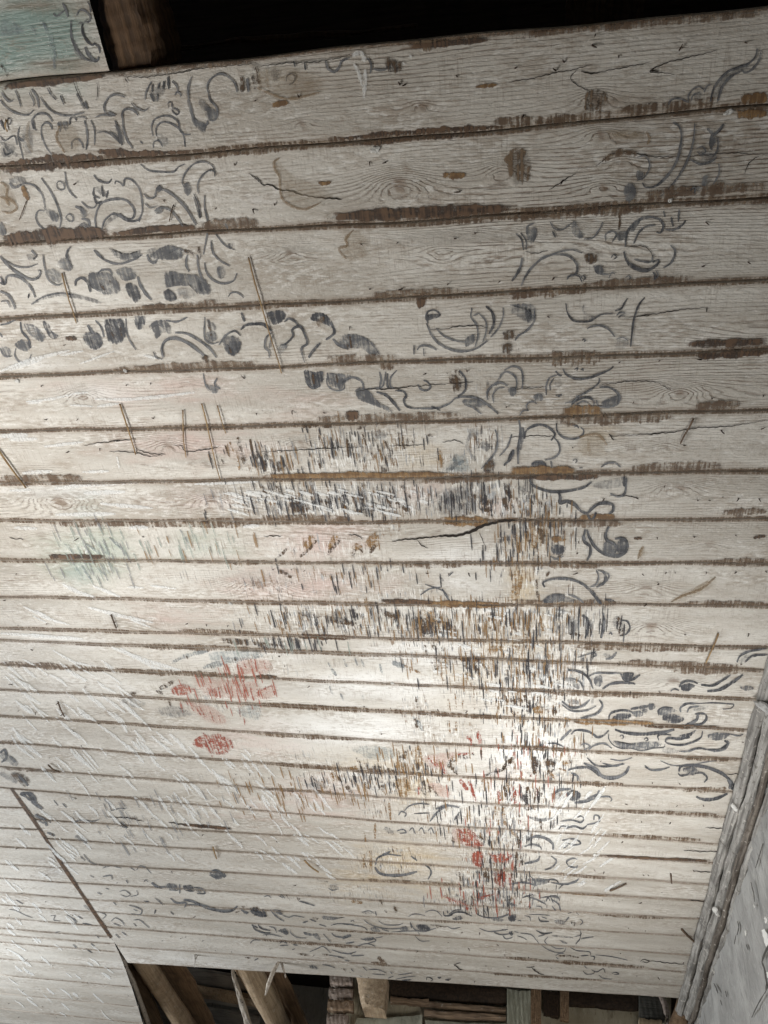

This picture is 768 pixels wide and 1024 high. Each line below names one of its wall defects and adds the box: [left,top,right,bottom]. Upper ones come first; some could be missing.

crack [248,173,342,200]
crack [393,519,516,548]